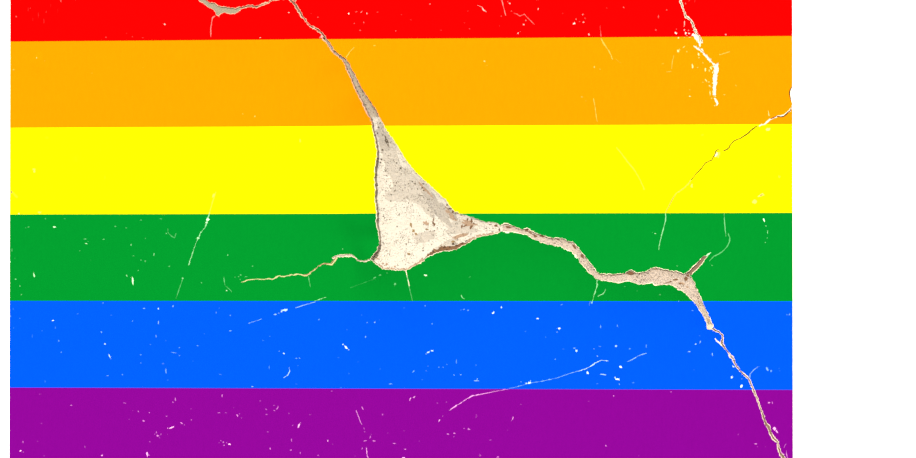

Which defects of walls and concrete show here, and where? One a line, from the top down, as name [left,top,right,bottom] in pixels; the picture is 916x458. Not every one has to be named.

crack [241,0,382,121]
crack [679,0,715,65]
crack [188,192,216,265]
crack [243,254,370,287]
spalling [370,117,509,271]
crack [501,223,601,304]
crack [685,217,730,275]
crack [659,87,792,246]
crack [712,328,785,458]